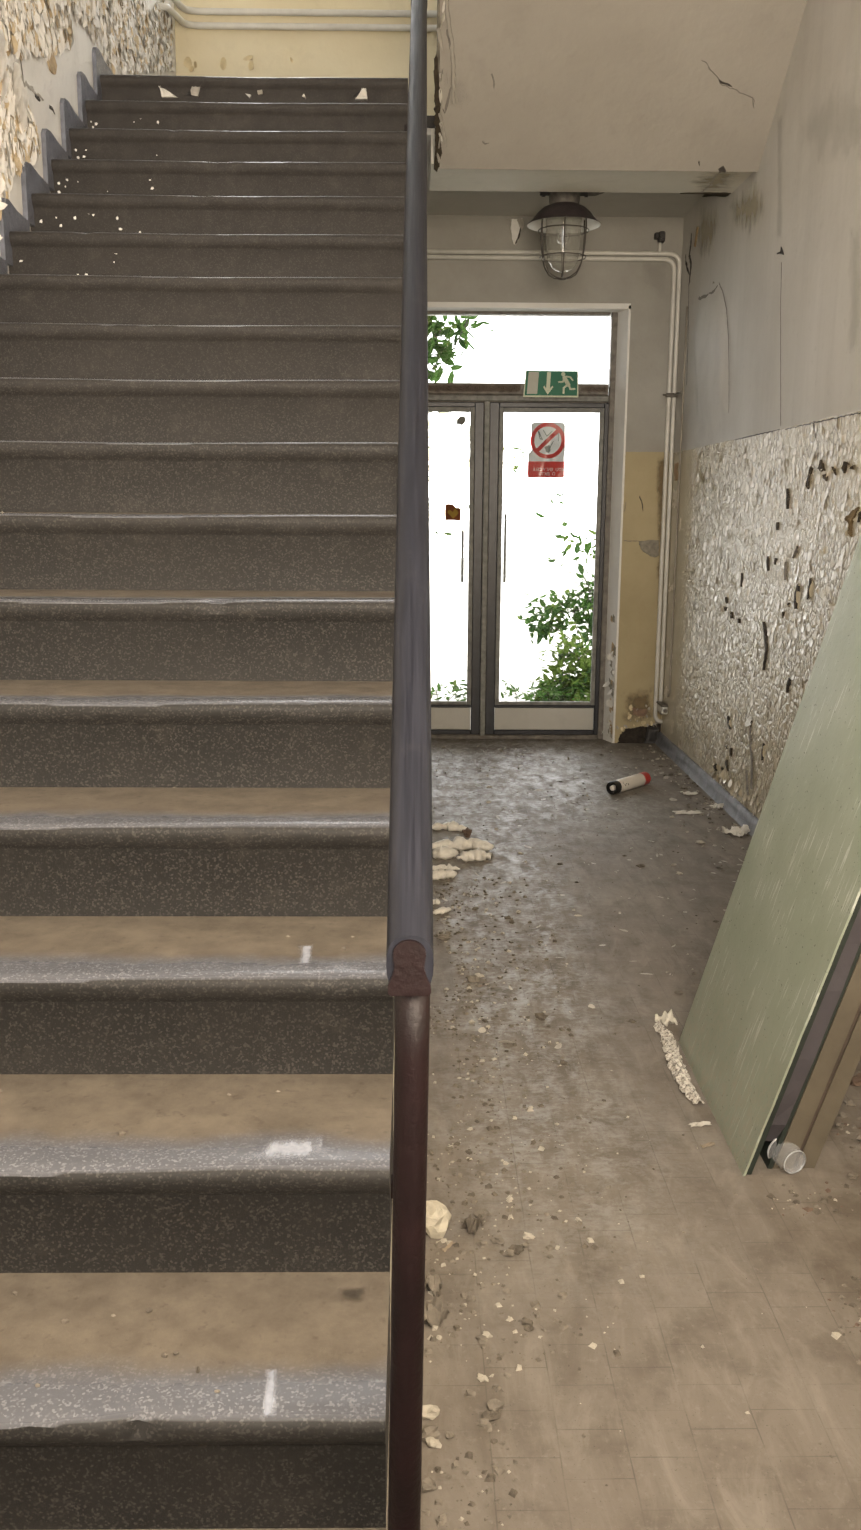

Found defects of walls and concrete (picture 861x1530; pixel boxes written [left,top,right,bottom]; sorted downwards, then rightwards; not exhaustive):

peeling [354,88,367,100]
crack [701,60,755,103]
peeling [596,417,861,882]